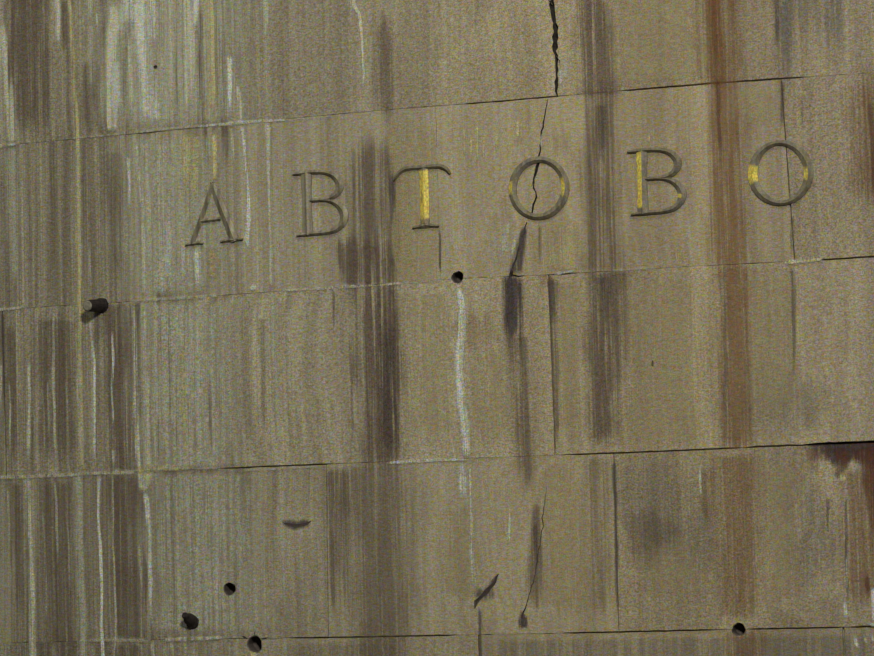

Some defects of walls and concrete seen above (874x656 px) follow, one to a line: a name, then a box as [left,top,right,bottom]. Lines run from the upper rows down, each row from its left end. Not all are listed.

water stain [0,0,284,656]
water stain [350,0,366,85]
water stain [287,134,481,596]
water stain [500,223,530,472]
crack [509,253,524,279]
crack [524,0,560,229]
water stain [539,224,576,316]
water stain [582,0,625,439]
corrosion [707,0,737,264]
water stain [280,478,308,582]
crack [520,488,547,625]
corrosion [816,443,874,520]